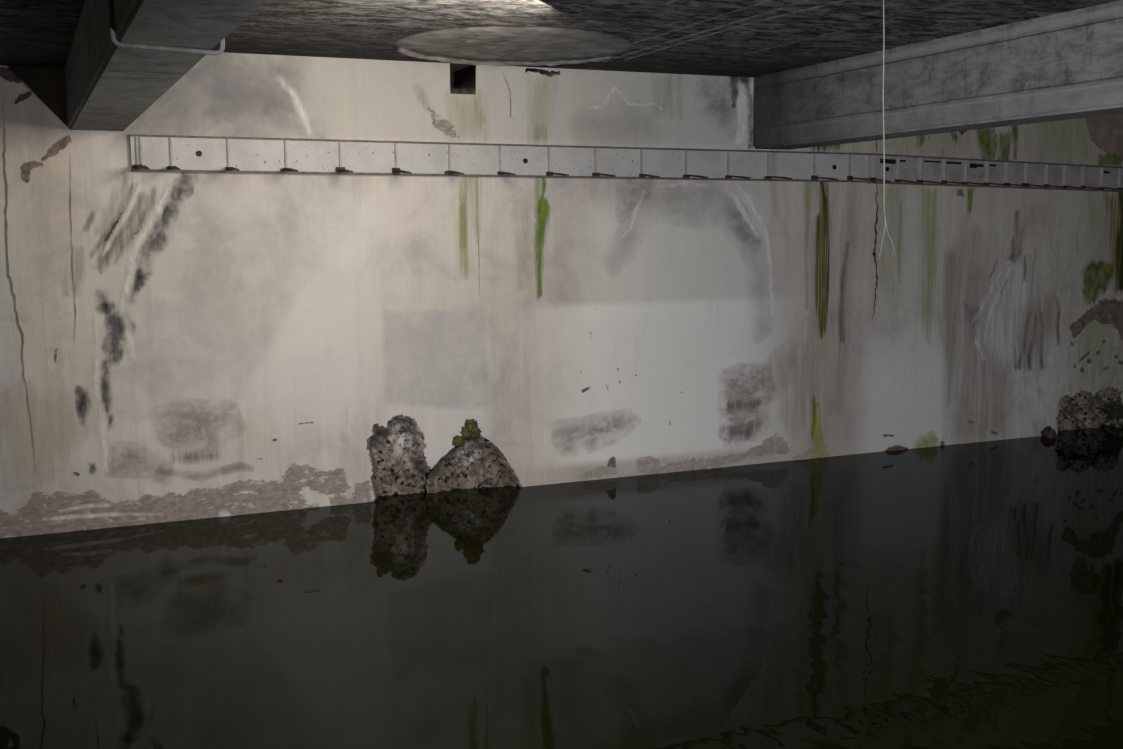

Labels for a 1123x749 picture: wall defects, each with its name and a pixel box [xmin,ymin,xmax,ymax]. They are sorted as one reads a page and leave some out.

flaking render [1085,114,1123,161]
crack [871,184,879,318]
leakage [1083,192,1123,302]
leakage [0,175,192,473]
spalling [1055,297,1123,433]
peeling [0,414,522,538]